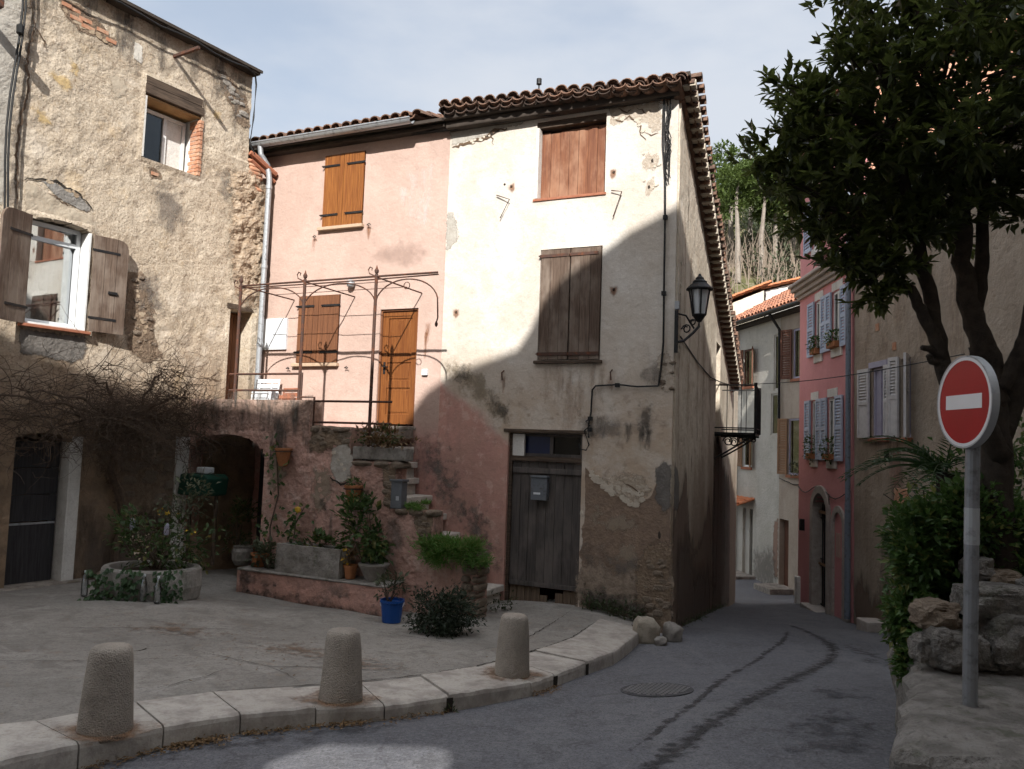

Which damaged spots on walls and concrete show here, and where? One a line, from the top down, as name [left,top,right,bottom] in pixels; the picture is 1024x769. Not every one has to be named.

flaking render [59,0,117,47]
water stain [626,409,650,442]
flaking render [575,468,674,633]